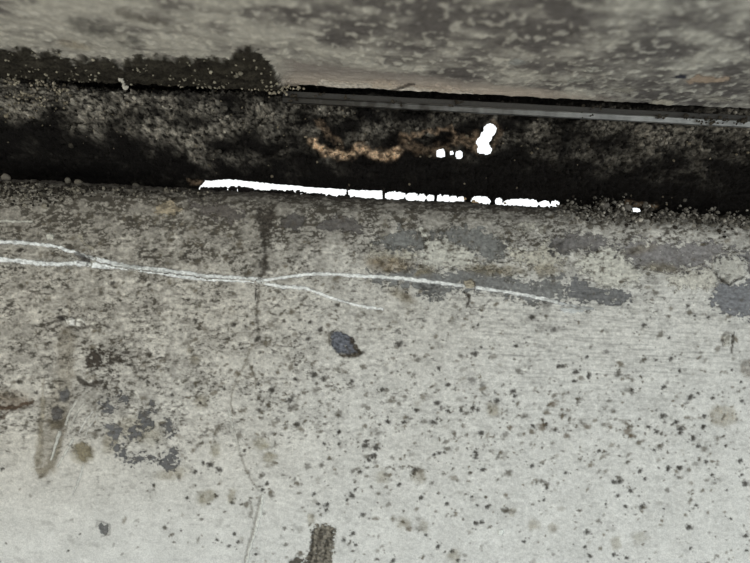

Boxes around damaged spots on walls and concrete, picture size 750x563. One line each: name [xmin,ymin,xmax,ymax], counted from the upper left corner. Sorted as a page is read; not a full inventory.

damp [318,79,473,94]
crack [0,207,593,313]